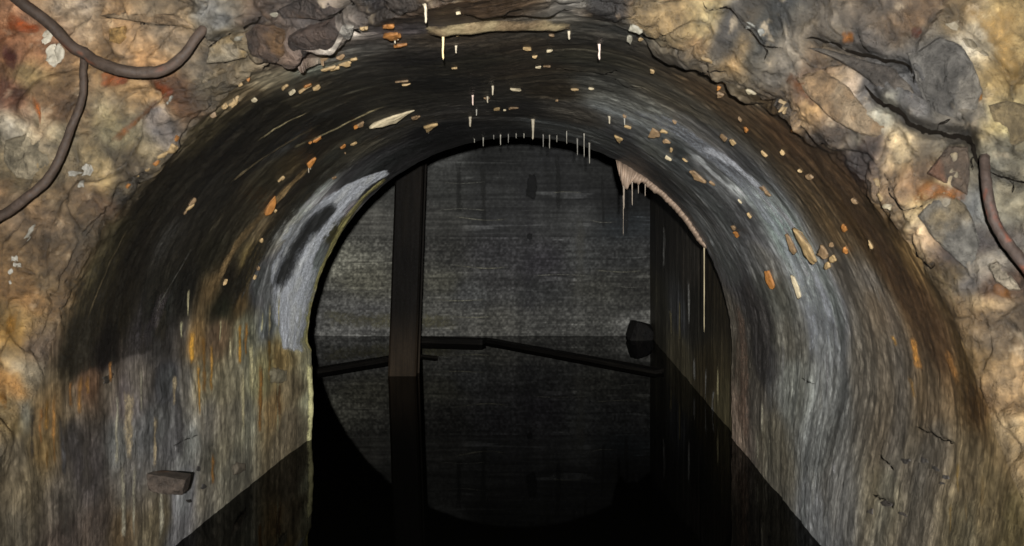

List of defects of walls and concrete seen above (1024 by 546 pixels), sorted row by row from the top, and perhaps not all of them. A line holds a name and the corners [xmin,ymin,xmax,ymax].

leakage [616,160,707,249]
leakage [115,376,142,457]
corrosion [189,335,213,410]
leakage [242,347,254,422]
leakage [121,473,135,534]